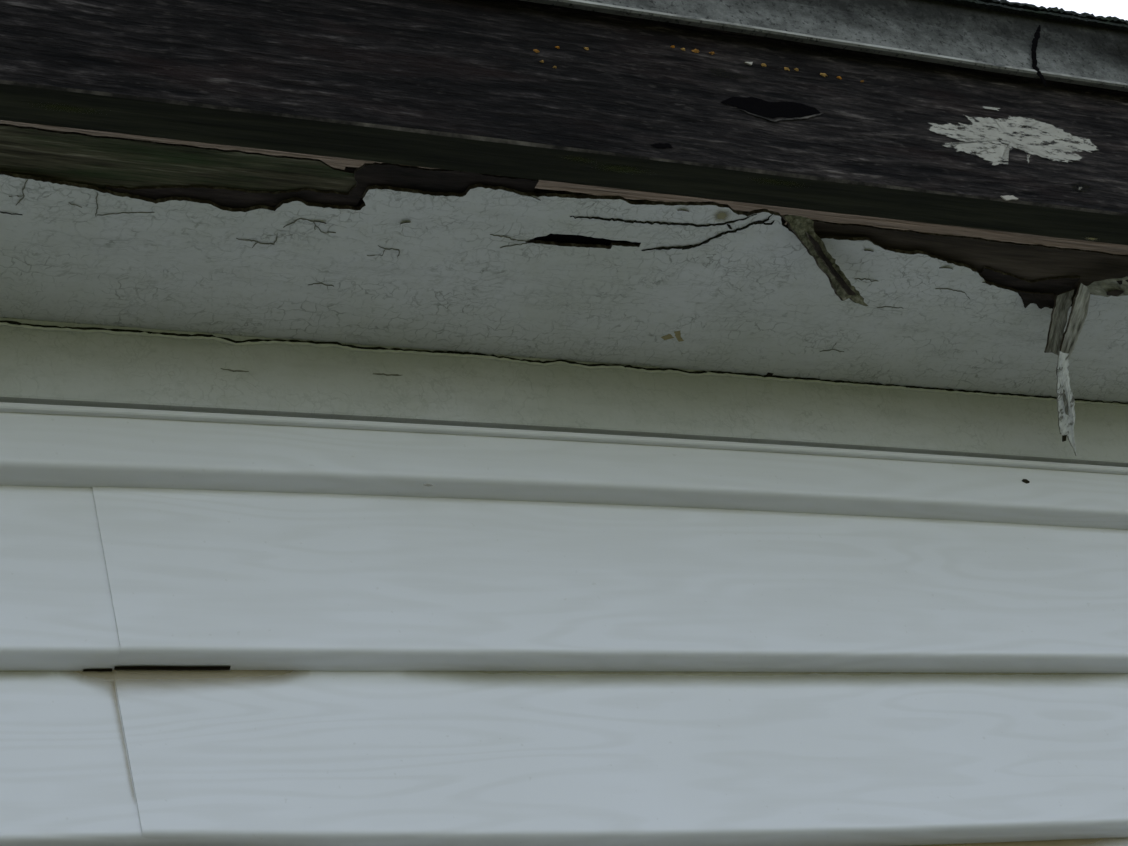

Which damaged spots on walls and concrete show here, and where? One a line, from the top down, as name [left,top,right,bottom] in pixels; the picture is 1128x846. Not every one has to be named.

crack [1031,25,1047,87]
peeling [929,106,1097,165]
peeling [0,123,591,209]
crack [0,180,28,215]
crack [69,193,154,216]
crack [236,218,336,248]
crack [490,234,530,248]
crack [570,213,774,251]
peeling [812,220,1128,309]
crack [854,278,902,308]
crack [0,320,1128,407]